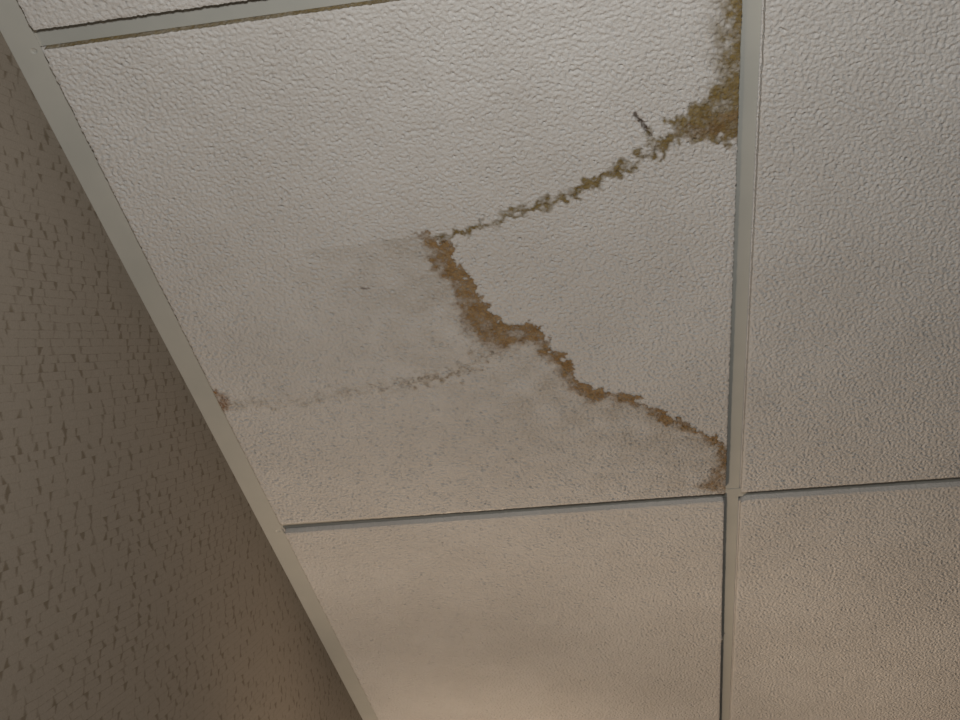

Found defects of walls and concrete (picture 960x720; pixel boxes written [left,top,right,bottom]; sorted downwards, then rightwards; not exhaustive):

water stain [424,0,742,491]